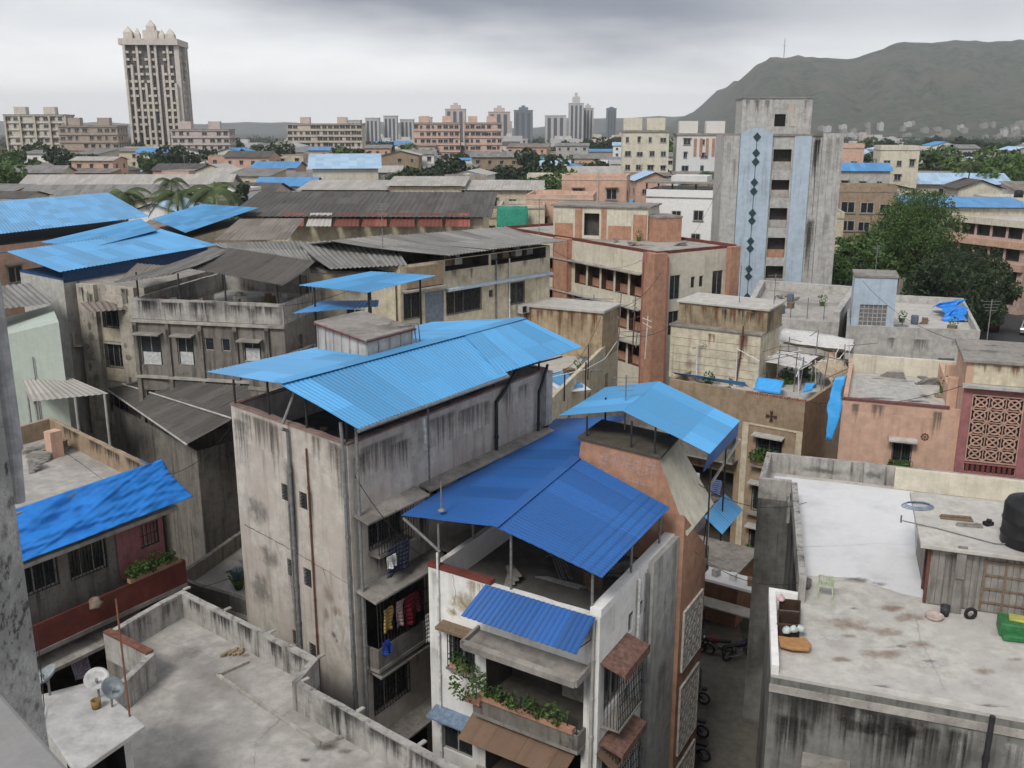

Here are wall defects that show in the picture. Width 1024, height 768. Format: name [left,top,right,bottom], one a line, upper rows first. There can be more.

water stain [805,221,813,265]
water stain [235,416,277,448]
water stain [287,466,298,547]
water stain [213,612,250,640]
water stain [777,697,970,761]